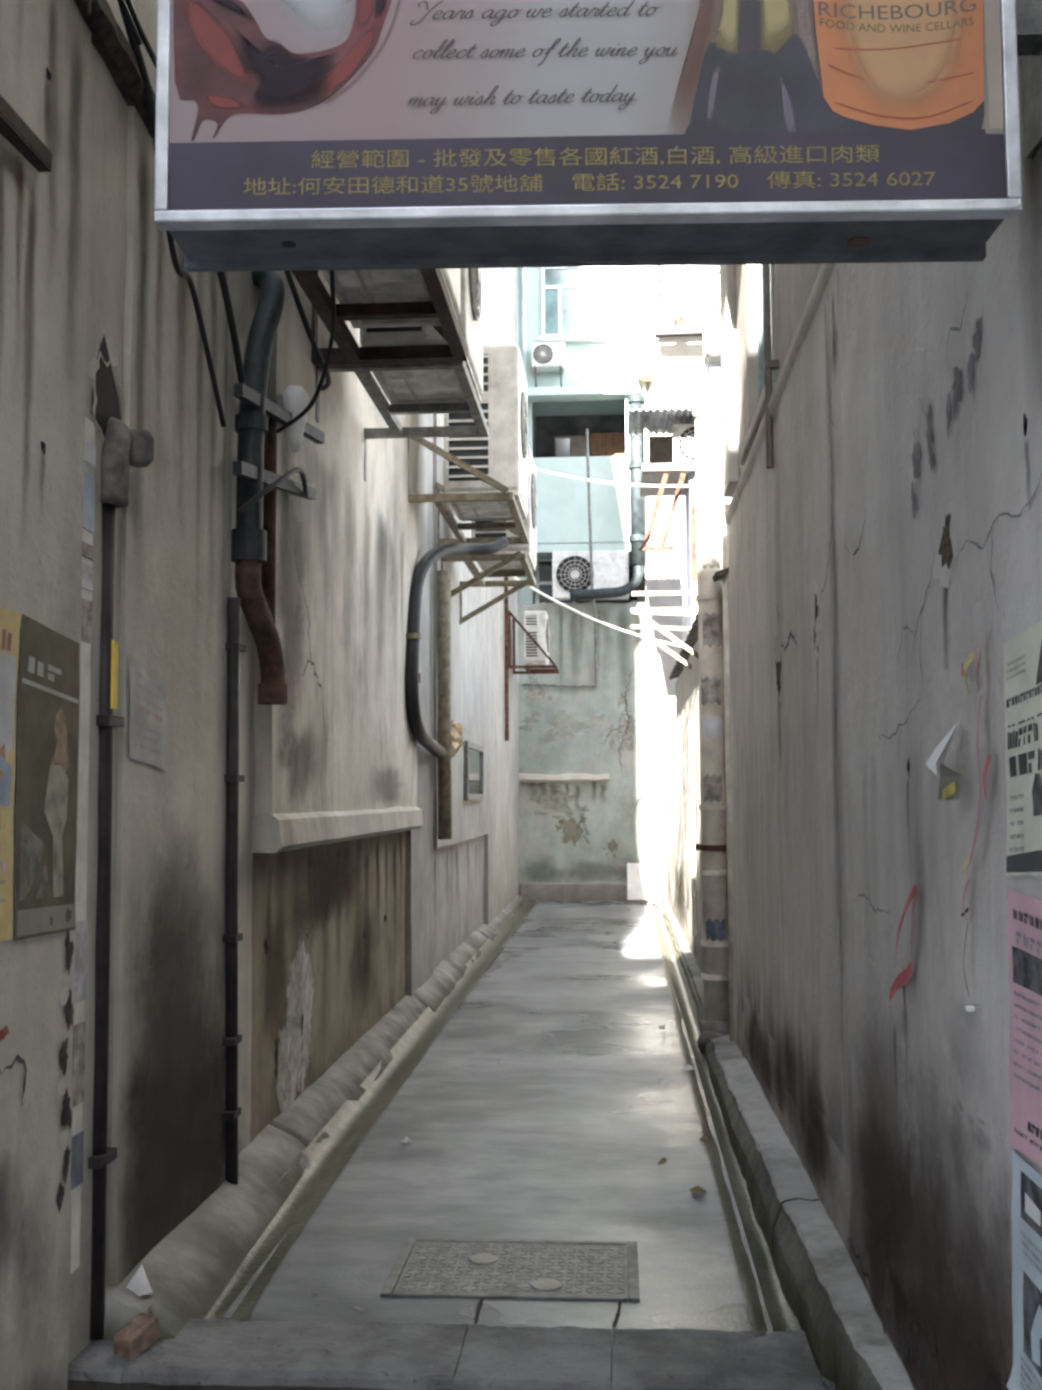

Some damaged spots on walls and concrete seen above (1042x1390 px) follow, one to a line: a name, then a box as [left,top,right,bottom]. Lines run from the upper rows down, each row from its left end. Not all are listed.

peeling [911,319,981,518]
flaking render [933,502,959,588]
crack [878,473,1042,761]
leakage [750,1023,824,1167]
leakage [860,1146,999,1390]